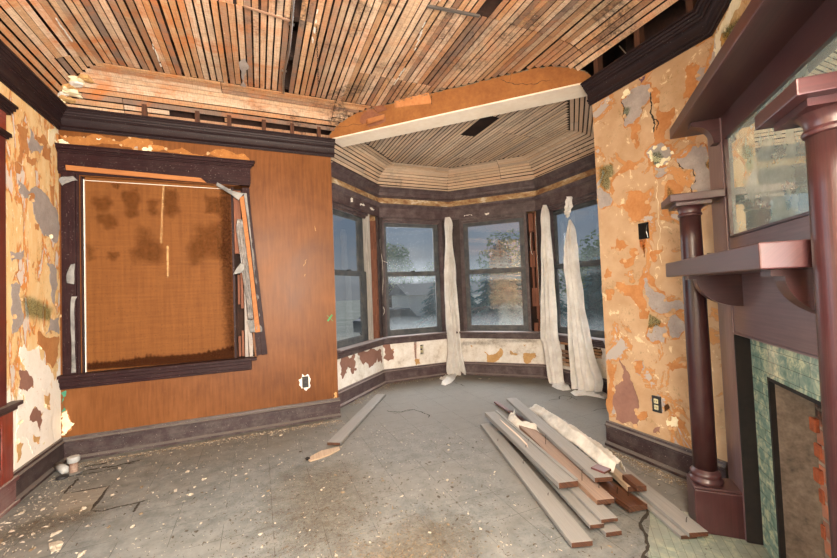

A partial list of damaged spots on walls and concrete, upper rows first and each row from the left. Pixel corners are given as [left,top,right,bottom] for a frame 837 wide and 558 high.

peeling [713,0,742,57]
crack [649,92,659,139]
peeling [596,75,710,222]
peeling [14,124,249,243]
water stain [23,297,51,319]
peeling [604,266,685,344]
peeling [16,262,62,463]
peeling [61,391,74,436]
peeling [340,344,394,379]
peeling [593,347,648,428]
crack [70,455,142,477]
crack [639,509,650,558]